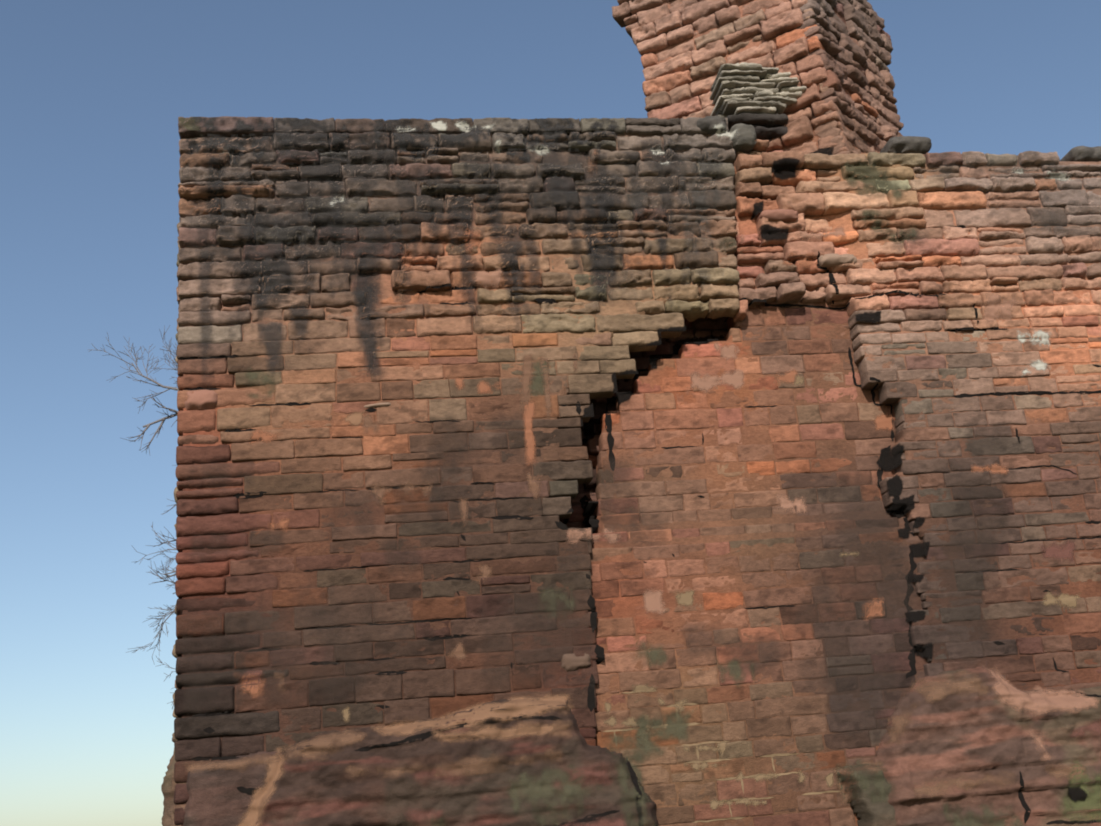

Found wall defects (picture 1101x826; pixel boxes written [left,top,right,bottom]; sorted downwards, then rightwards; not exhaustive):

damp [186,117,619,369]
damp [647,144,719,235]
crack [661,433,704,449]
crack [848,347,917,678]